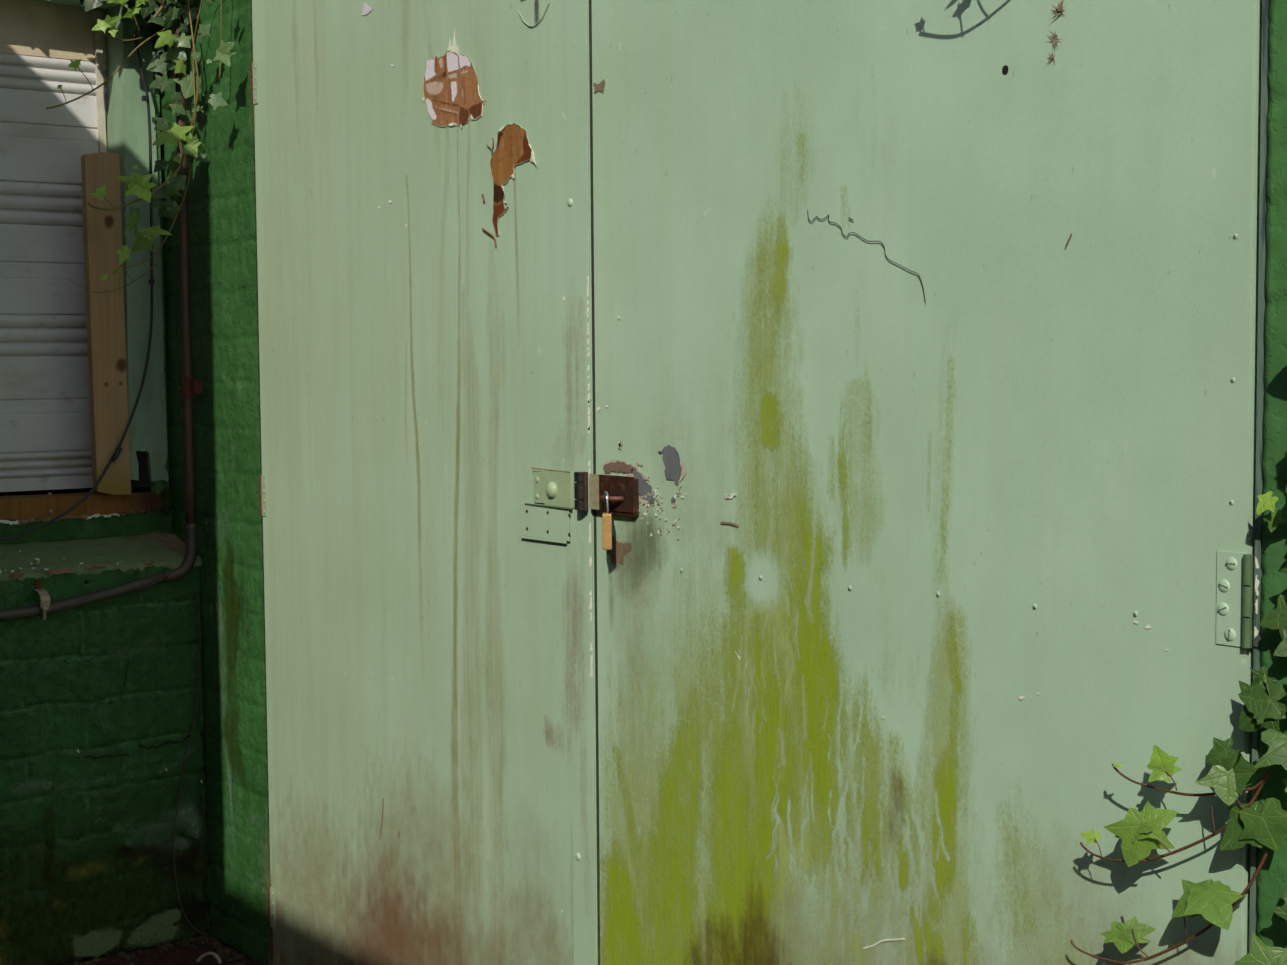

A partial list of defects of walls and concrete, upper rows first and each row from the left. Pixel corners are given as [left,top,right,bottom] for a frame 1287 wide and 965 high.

peeling [422,30,486,128]
peeling [482,122,536,246]
crack [807,210,926,303]
spalling [586,276,608,433]
peeling [588,440,686,540]
peeling [607,536,632,565]